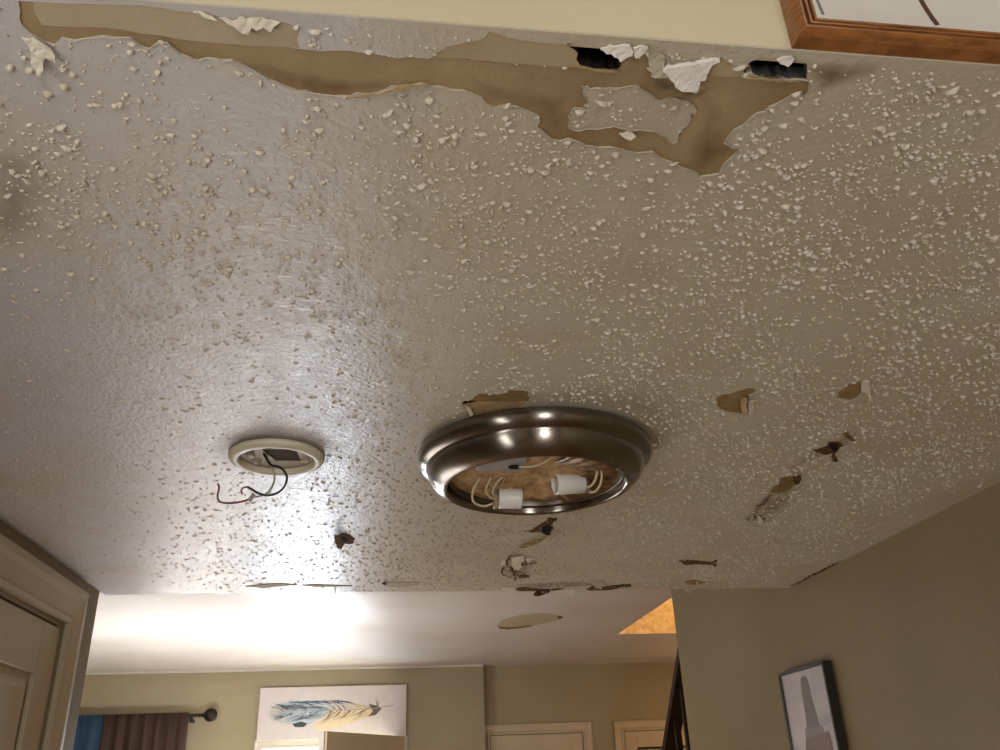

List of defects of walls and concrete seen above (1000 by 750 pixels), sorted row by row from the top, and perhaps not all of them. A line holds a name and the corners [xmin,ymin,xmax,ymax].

peeling [19,1,810,177]
peeling [462,390,530,417]
peeling [716,388,756,417]
peeling [838,380,873,401]
peeling [747,474,801,525]
flaking render [334,534,355,549]
crack [500,554,631,596]
peeling [498,613,563,630]